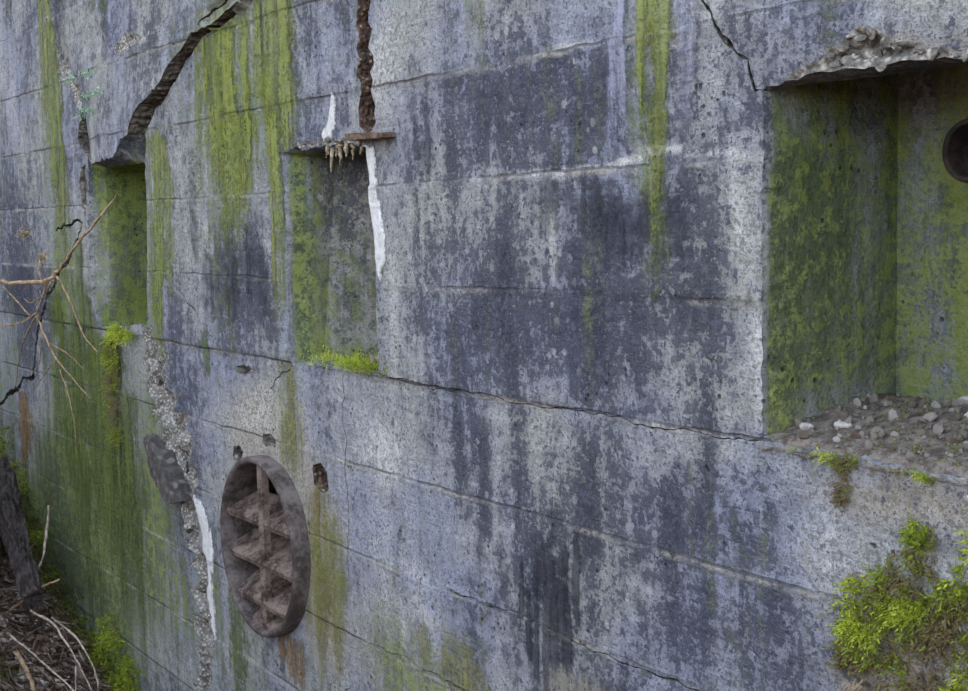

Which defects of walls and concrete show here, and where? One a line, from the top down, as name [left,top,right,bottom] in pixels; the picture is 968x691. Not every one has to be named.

crack [127,0,242,135]
crack [701,0,762,91]
spalling [784,26,968,80]
spalling [142,322,216,691]
spalling [313,463,329,493]